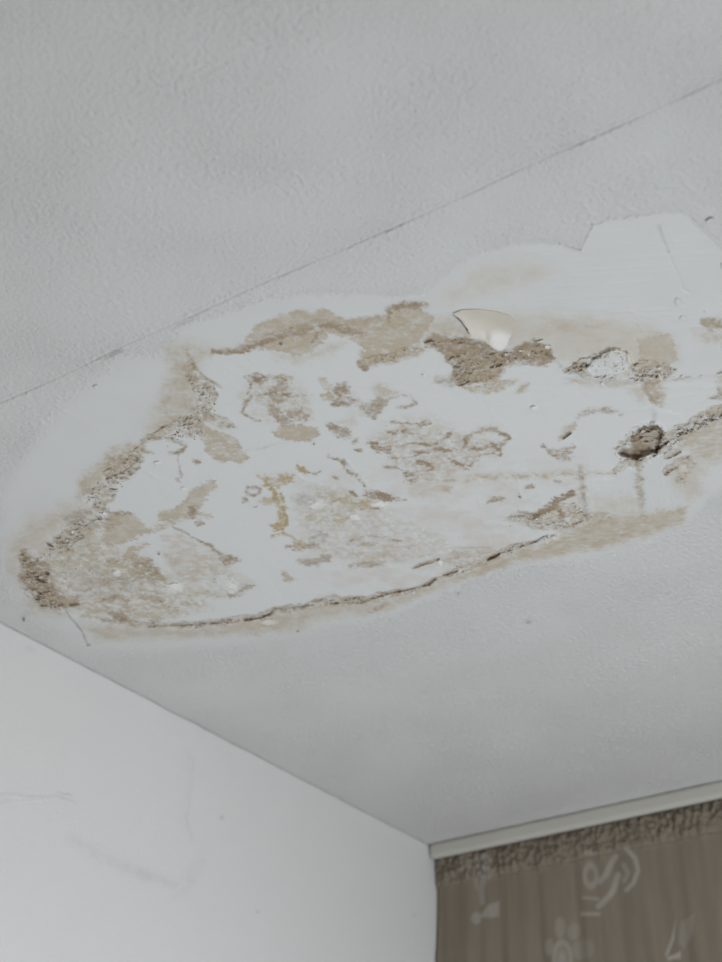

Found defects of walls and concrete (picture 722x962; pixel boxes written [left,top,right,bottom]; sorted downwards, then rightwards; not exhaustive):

water stain [0,252,722,644]
spalling [18,309,722,628]